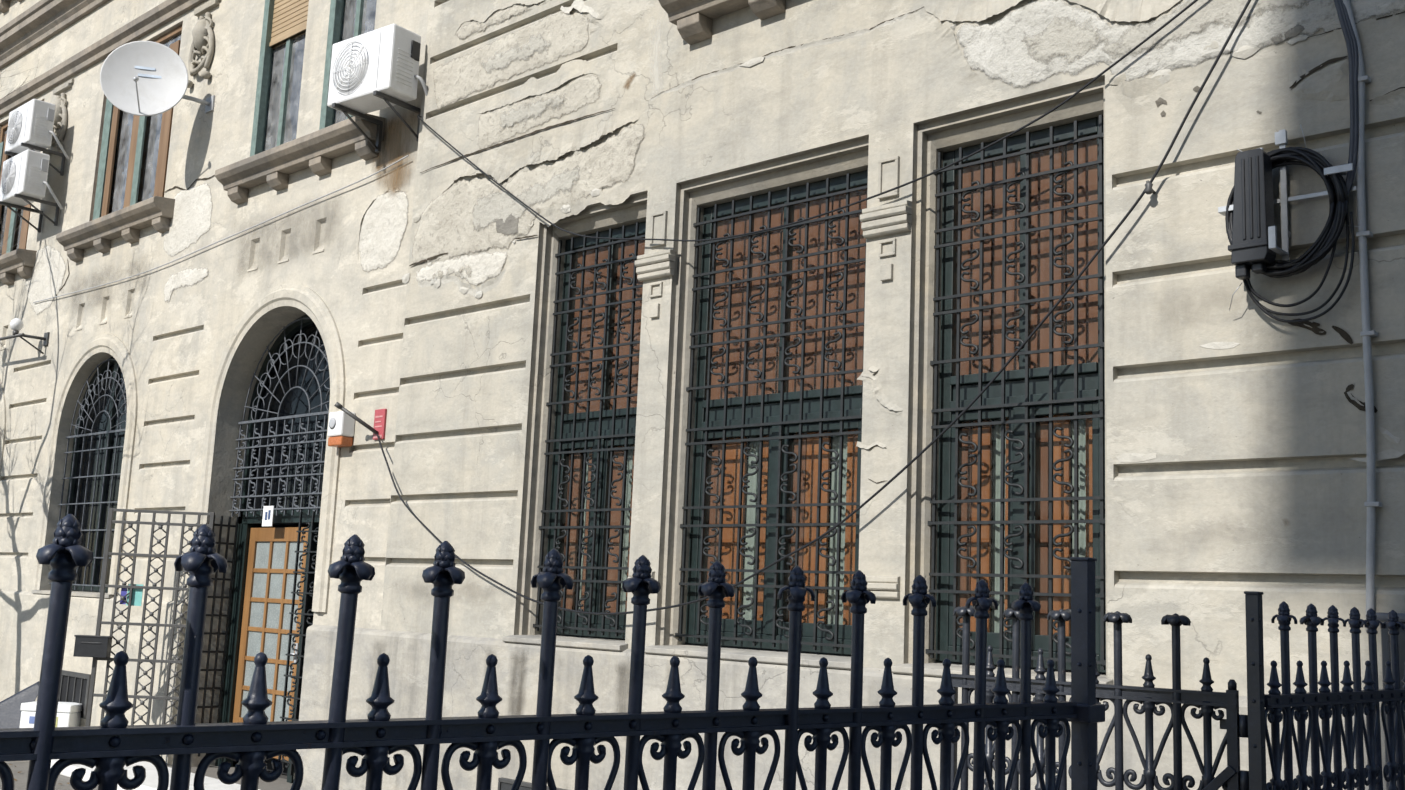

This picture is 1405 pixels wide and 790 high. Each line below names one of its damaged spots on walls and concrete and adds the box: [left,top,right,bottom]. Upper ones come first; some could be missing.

flaking render [433,0,610,149]
crack [651,7,923,101]
flaking render [920,0,1405,117]
crack [1369,87,1405,105]
flaking render [25,245,66,315]
flaking render [164,183,213,301]
flaking render [355,182,408,272]
flaking render [402,252,507,299]
peeling [857,366,903,415]